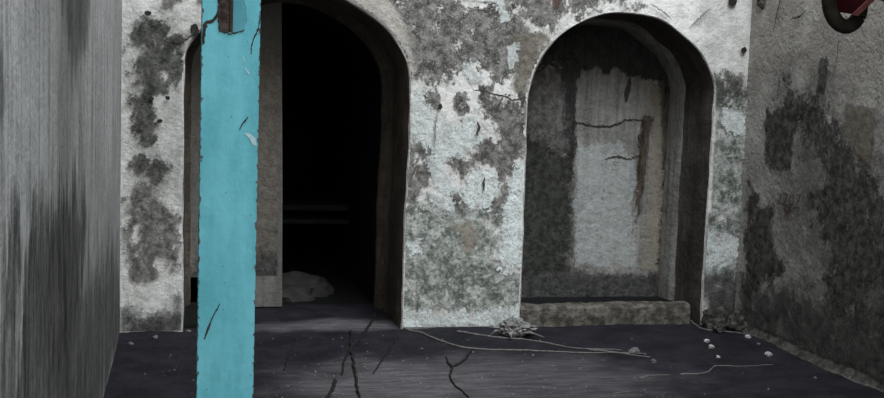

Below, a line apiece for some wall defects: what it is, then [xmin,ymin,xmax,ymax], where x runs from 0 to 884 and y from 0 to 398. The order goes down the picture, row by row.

damp [0,0,188,398]
damp [404,52,656,324]
crack [570,119,646,128]
crack [605,152,642,160]
damp [704,55,884,386]